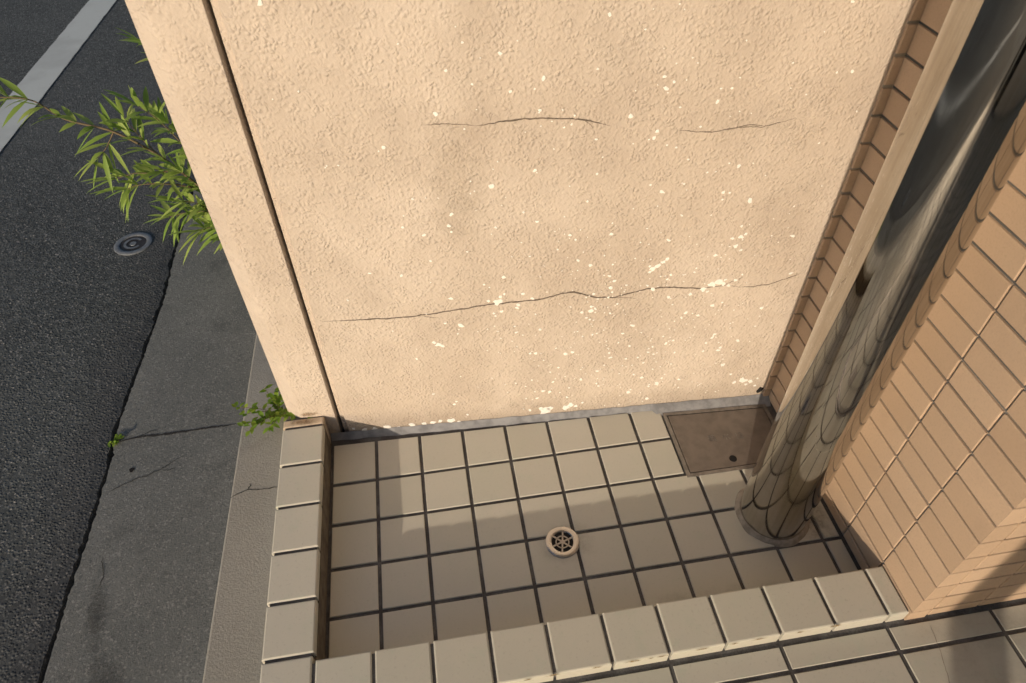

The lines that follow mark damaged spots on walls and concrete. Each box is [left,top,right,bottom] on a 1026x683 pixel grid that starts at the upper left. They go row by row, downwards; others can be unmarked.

crack [430,117,609,128]
crack [680,118,795,133]
crack [342,275,796,321]
crack [111,424,235,491]